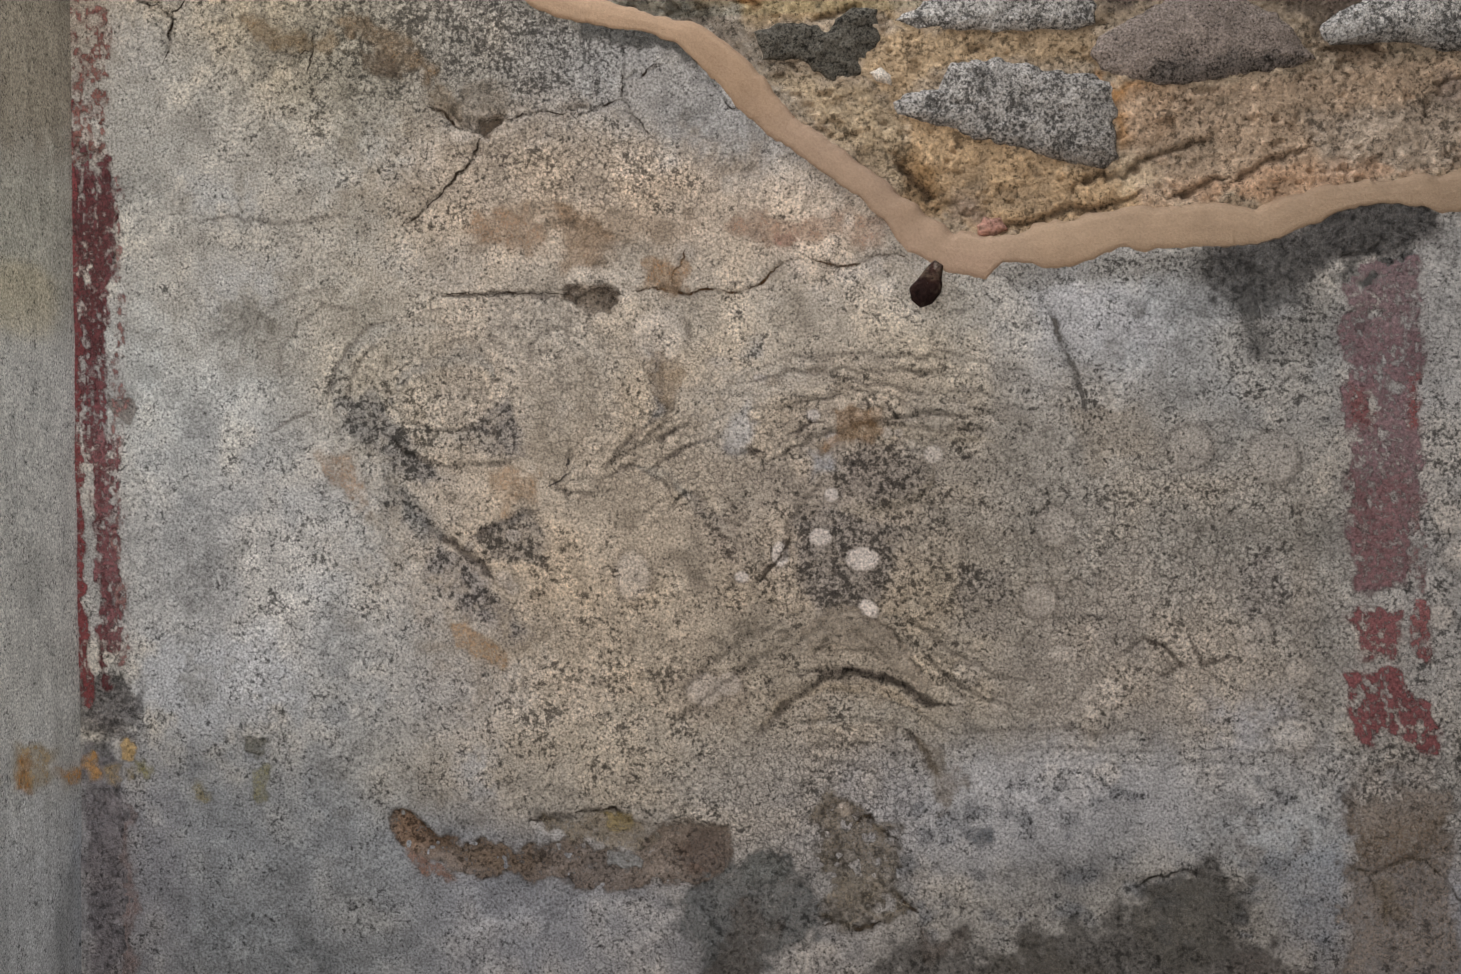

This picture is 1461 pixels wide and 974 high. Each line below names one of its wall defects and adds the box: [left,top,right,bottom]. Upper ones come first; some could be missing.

crack [401,58,661,226]
crack [447,290,566,298]
crack [625,250,910,296]
spalling [389,808,734,893]
leakage [668,851,822,974]
spalling [810,790,910,930]
leakage [873,857,1318,974]